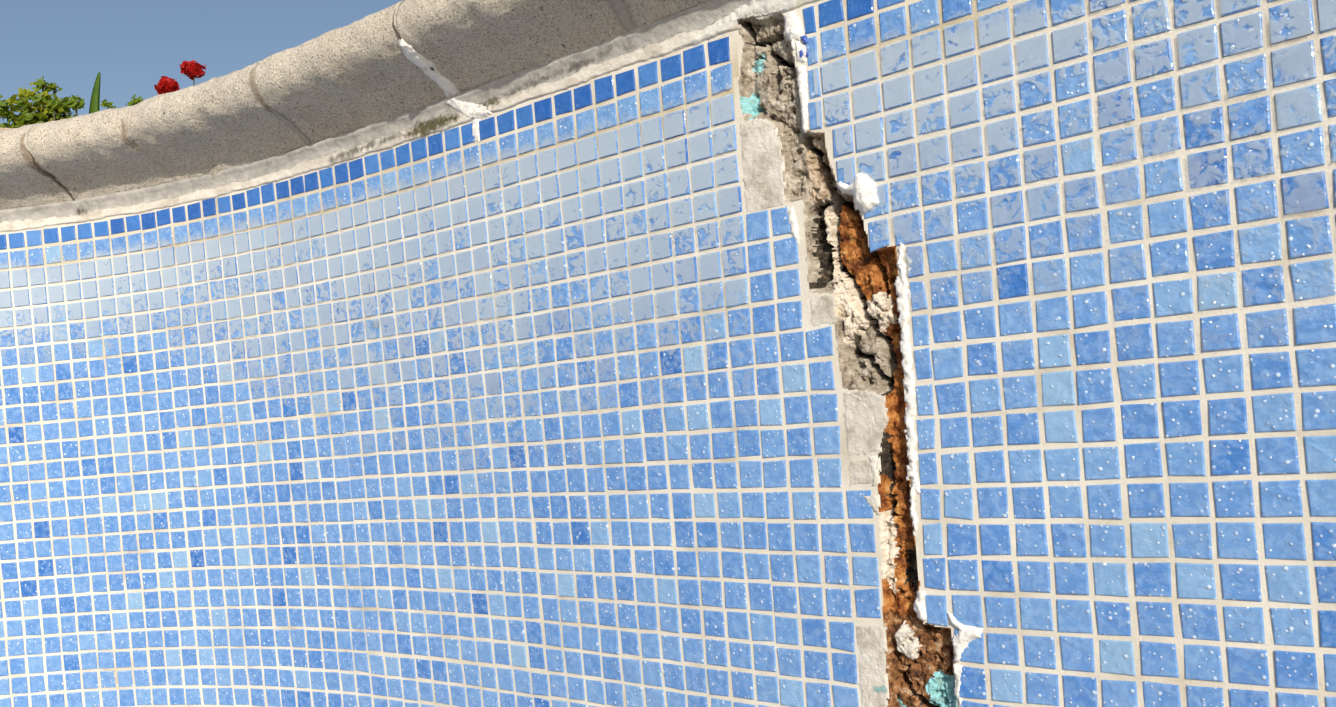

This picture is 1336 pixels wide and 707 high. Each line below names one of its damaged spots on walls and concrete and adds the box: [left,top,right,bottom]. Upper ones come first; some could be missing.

crack [392,9,492,119]
spalling [796,35,809,63]
crack [24,147,75,201]
peeling [739,118,786,212]
peeling [810,295,838,327]
peeling [843,388,889,515]
peeling [856,625,890,707]